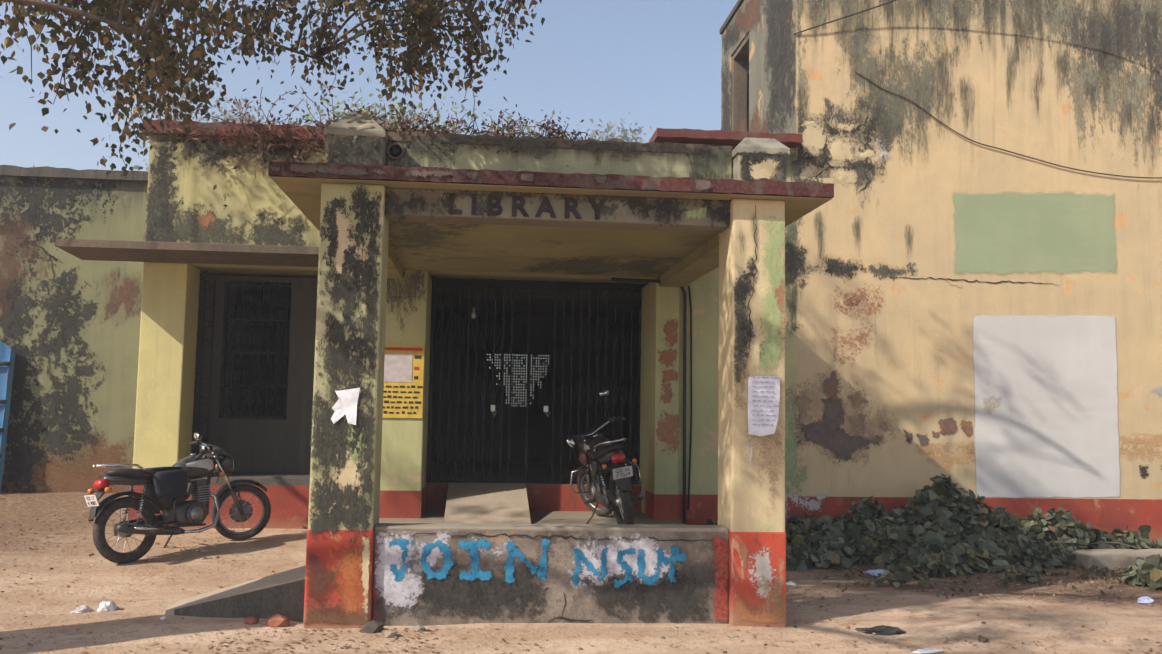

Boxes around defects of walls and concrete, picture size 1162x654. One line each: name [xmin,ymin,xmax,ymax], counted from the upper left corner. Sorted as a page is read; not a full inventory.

damp [721,0,1162,162]
damp [326,134,803,181]
damp [0,176,131,493]
damp [145,135,731,543]
peeling [656,319,679,454]
damp [733,258,769,381]
peeling [759,217,786,370]
flaking render [793,370,888,462]
damp [785,216,916,336]
flaking render [903,417,973,446]
crack [891,277,1055,288]
peeling [332,531,370,624]